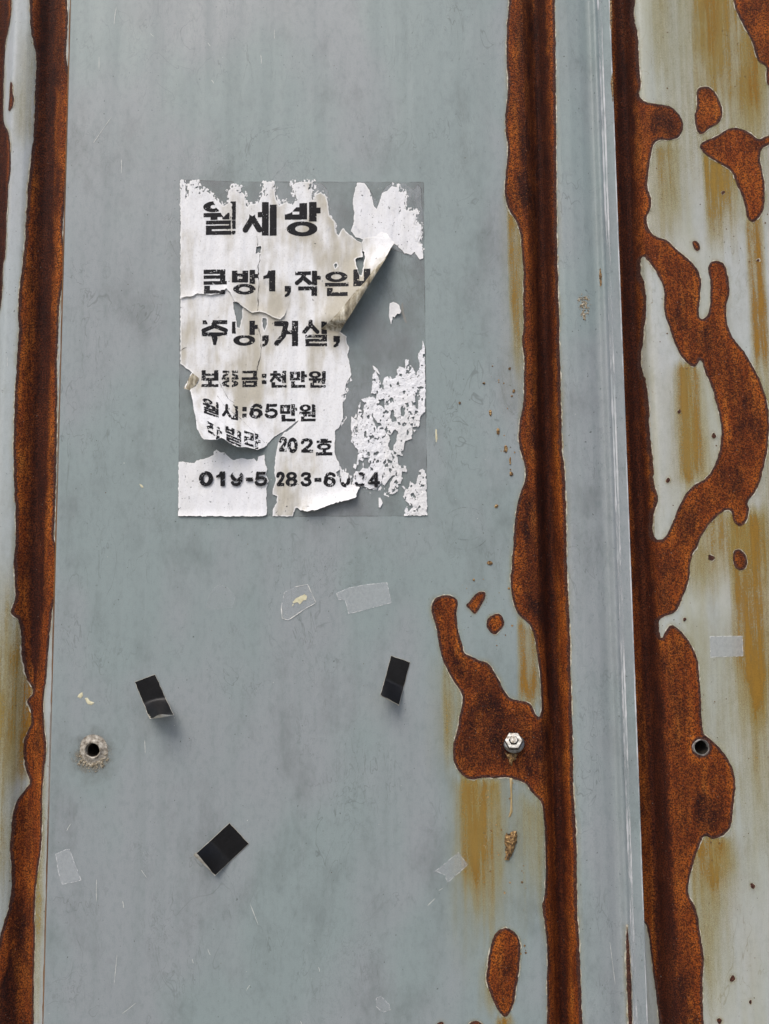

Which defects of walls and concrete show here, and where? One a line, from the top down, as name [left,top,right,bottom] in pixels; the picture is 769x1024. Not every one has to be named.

rust [0,0,71,1024]
rust [431,0,583,1024]
rust [611,0,769,1024]